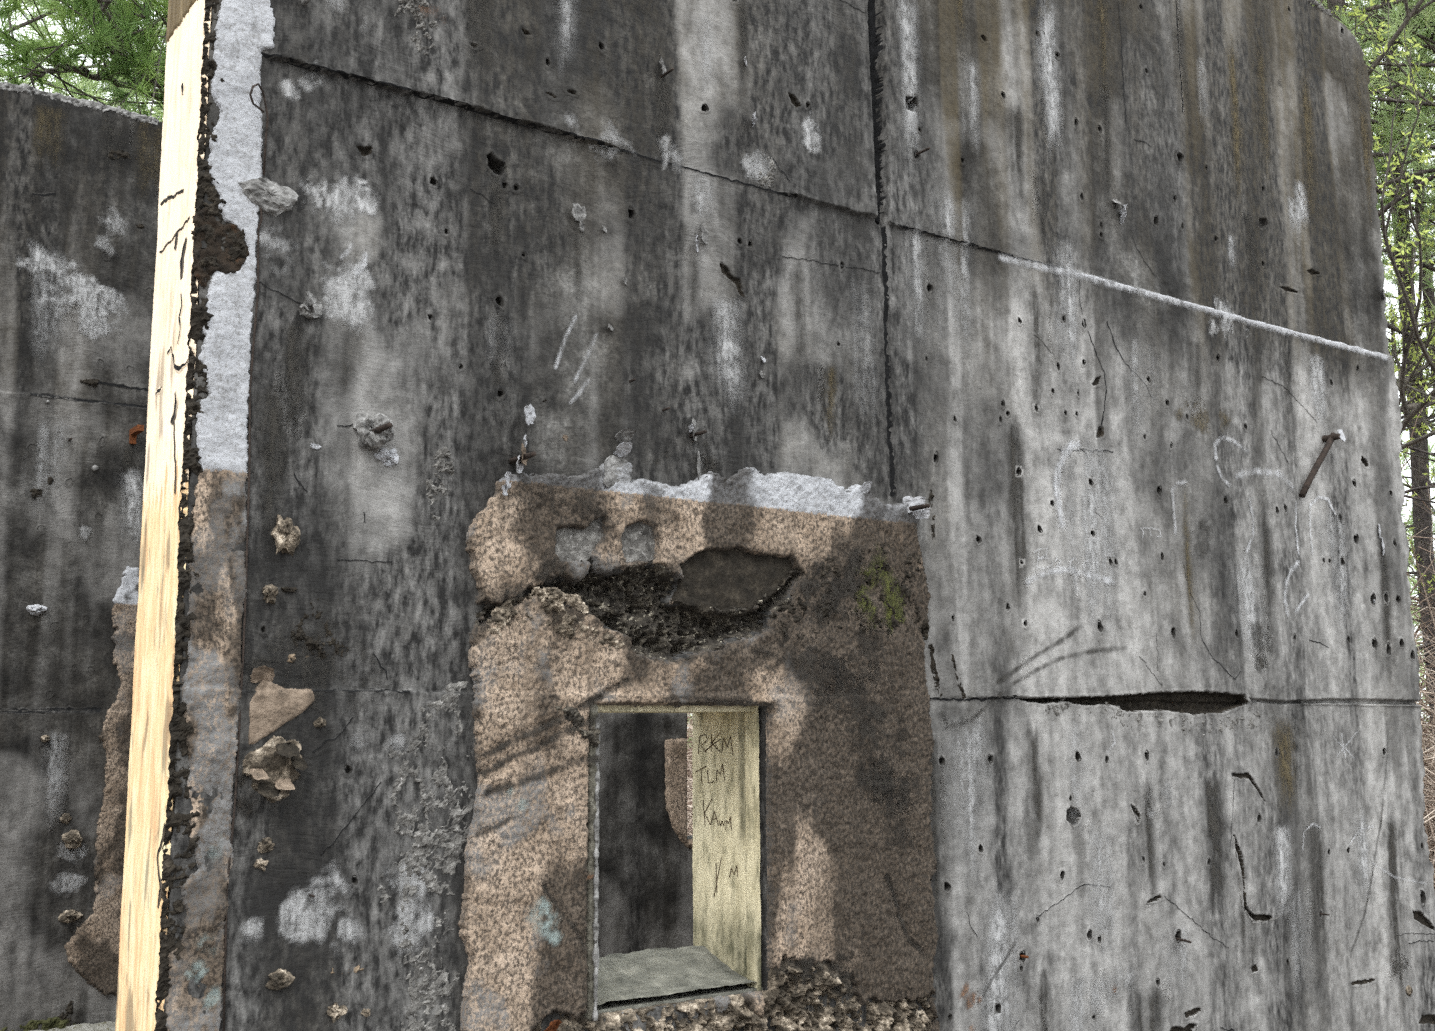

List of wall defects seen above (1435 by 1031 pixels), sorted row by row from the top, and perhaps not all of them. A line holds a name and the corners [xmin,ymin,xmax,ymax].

peeling [247,418,258,436]
spalling [154,0,249,1031]
peeling [902,489,936,540]
spalling [475,518,966,699]
spalling [555,704,601,747]
spalling [0,1001,75,1031]
spalling [532,959,934,1031]